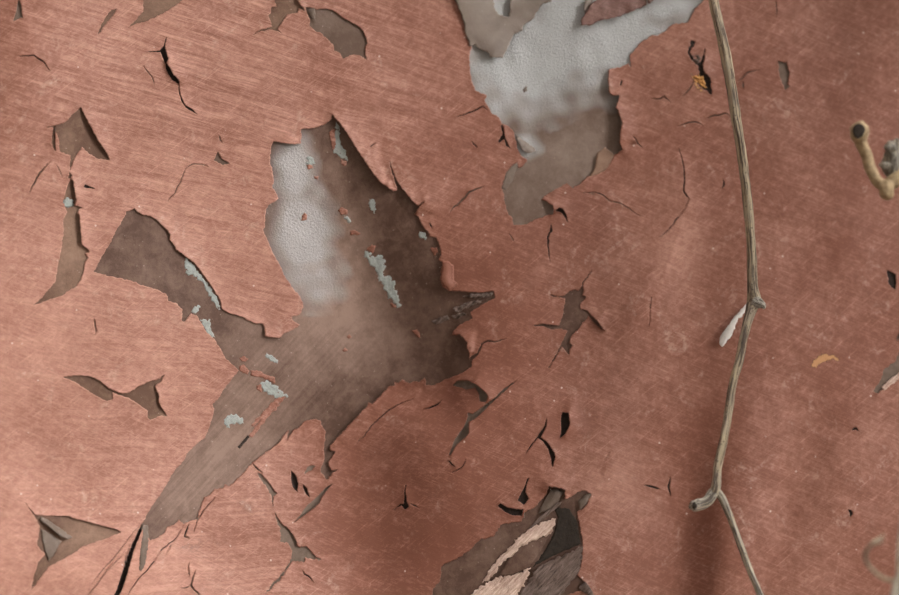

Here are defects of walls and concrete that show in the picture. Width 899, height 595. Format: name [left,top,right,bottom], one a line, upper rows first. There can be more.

peeling [128,0,182,28]
crack [144,39,195,113]
peeling [254,0,367,60]
peeling [455,0,703,225]
peeling [688,40,712,95]
peeling [34,108,505,571]
peeling [533,286,603,368]
peeling [873,352,899,393]
peeling [29,509,121,587]
crack [89,499,214,595]
peeling [265,514,321,594]
peeling [432,486,594,595]